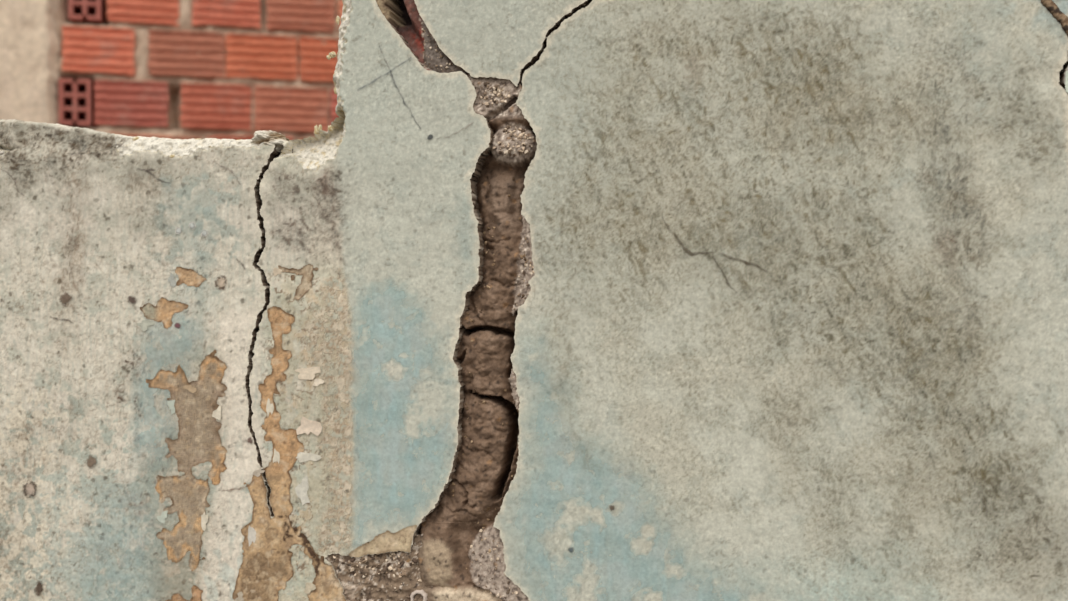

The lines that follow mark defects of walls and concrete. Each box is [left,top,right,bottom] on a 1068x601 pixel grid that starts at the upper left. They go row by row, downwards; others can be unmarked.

crack [1041,0,1068,36]
spalling [277,0,352,171]
crack [1059,63,1068,93]
peeling [128,296,188,331]
peeling [167,267,226,289]
crack [376,0,592,601]
peeling [146,350,227,571]
peeling [232,264,434,601]
crack [279,516,320,574]
peeling [165,585,203,601]